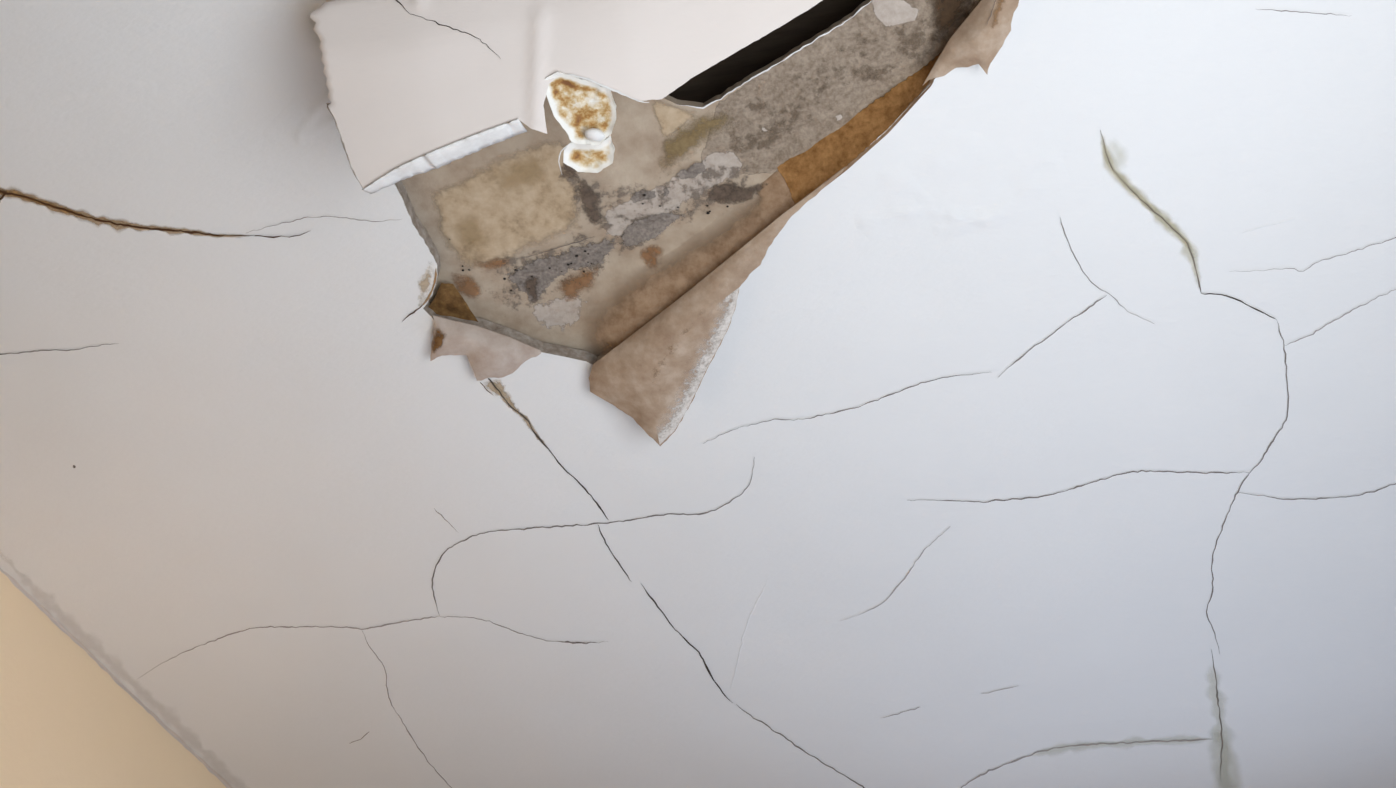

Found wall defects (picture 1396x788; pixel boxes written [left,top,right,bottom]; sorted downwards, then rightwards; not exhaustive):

crack [0,188,400,238]
flaking render [434,71,616,267]
damp [455,98,799,309]
flaking render [605,0,1019,236]
crack [0,344,111,355]
peeling [430,315,541,381]
flaking render [532,295,587,331]
crack [138,218,1154,788]
crack [910,130,1396,788]